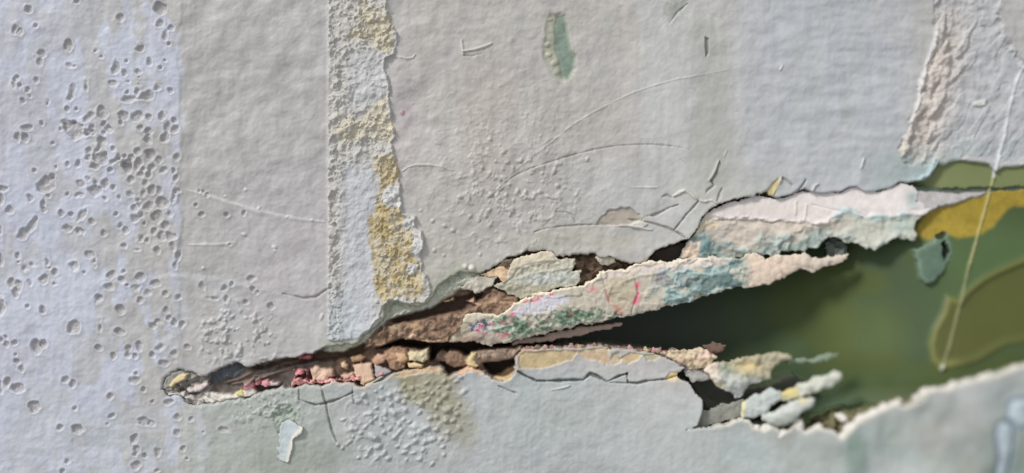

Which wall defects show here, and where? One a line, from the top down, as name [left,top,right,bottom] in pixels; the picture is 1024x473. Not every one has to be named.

peeling [542,10,579,84]
spalling [898,0,1024,184]
peeling [327,0,432,342]
peeling [759,178,780,197]
spalling [197,274,277,312]
peeling [461,251,582,299]
peeling [595,255,615,266]
peeling [395,366,440,378]
peeling [458,342,842,427]